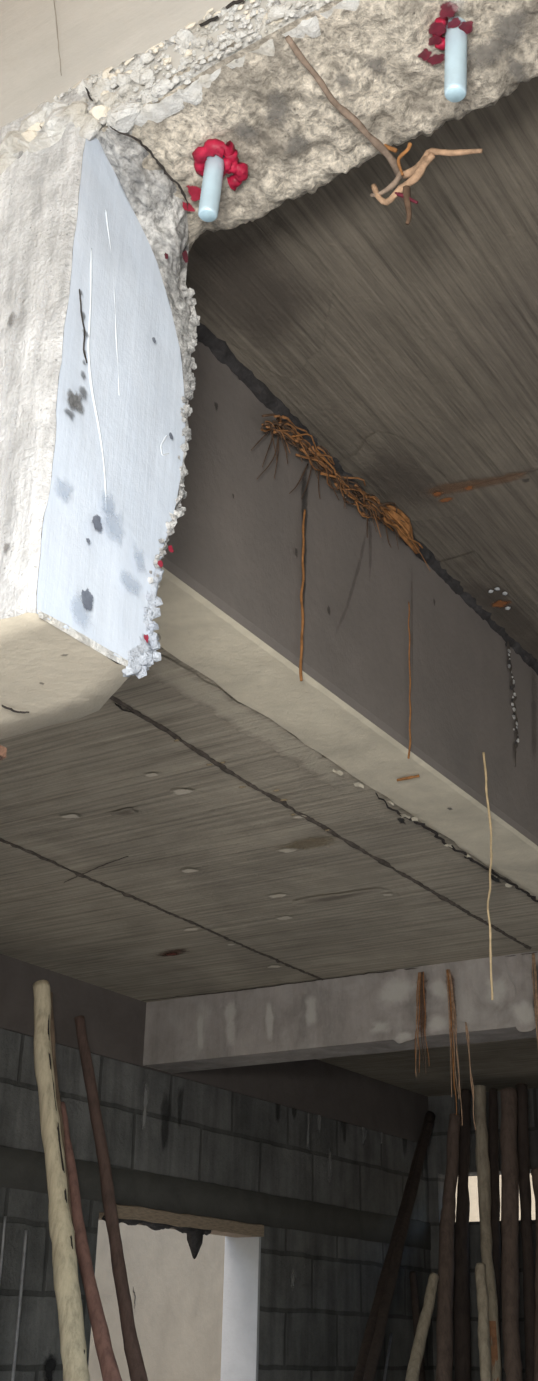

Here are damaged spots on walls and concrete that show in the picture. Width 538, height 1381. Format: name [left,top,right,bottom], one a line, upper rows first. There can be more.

spalling [0,0,538,679]
crack [2,705,29,713]
crack [109,695,538,957]
crack [0,838,416,1001]
corrosion [418,979,427,1032]